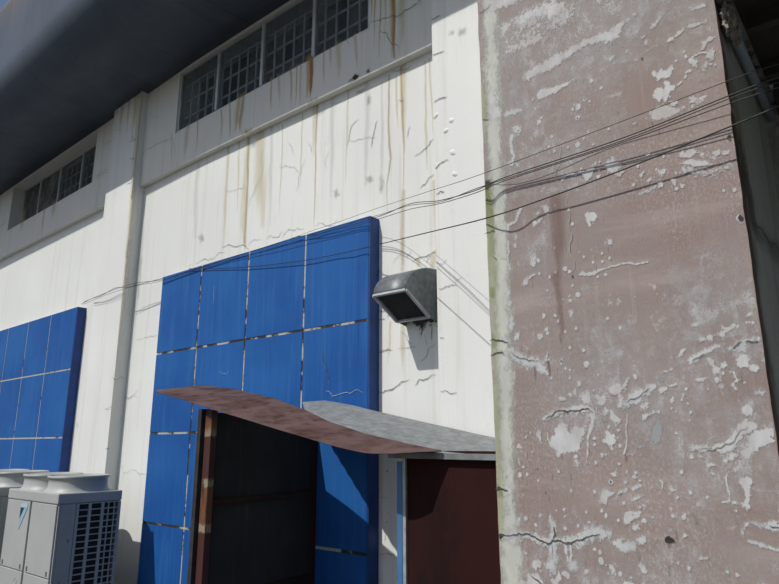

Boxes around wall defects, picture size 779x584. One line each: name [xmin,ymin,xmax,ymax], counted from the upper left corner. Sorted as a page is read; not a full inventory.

damp [485,180,497,368]
crack [379,332,453,394]
crack [499,527,600,555]